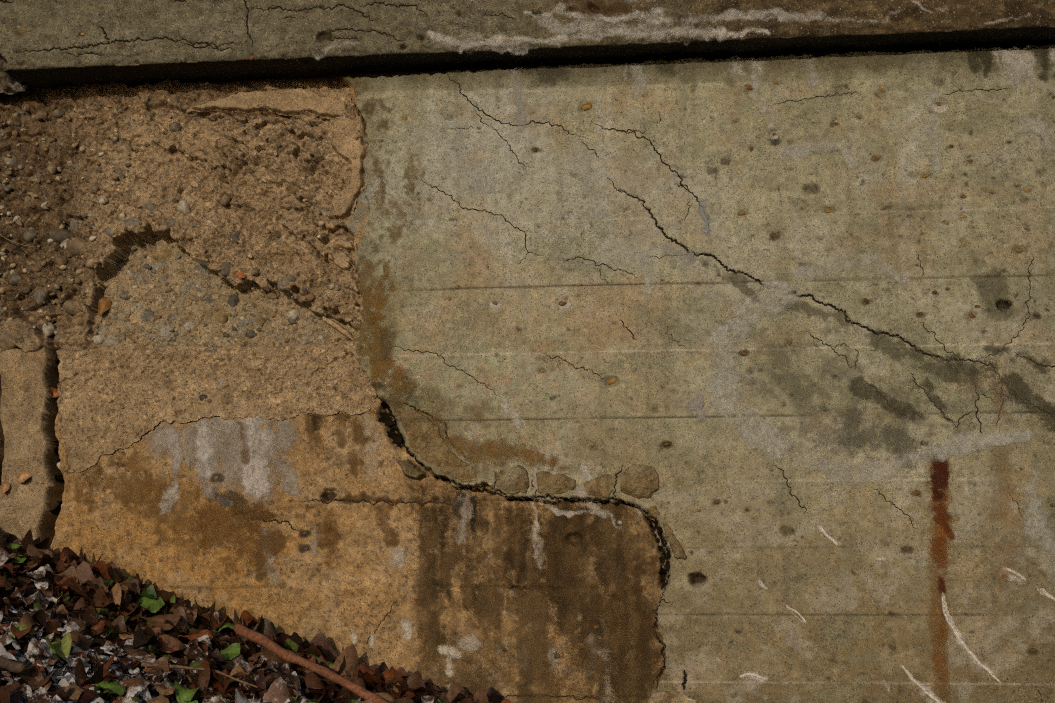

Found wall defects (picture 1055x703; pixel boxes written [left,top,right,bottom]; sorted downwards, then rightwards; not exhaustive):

spalling [0,57,377,475]
leakage [358,258,416,415]
crack [392,346,502,398]
crack [414,74,1055,436]
leakage [70,415,321,585]
spalling [299,530,311,552]
spalling [320,492,337,501]
leakage [336,411,660,703]
efflorescence [902,666,946,703]
rust [930,445,954,593]
efflorescence [942,592,1000,683]
leakage [1001,567,1026,582]